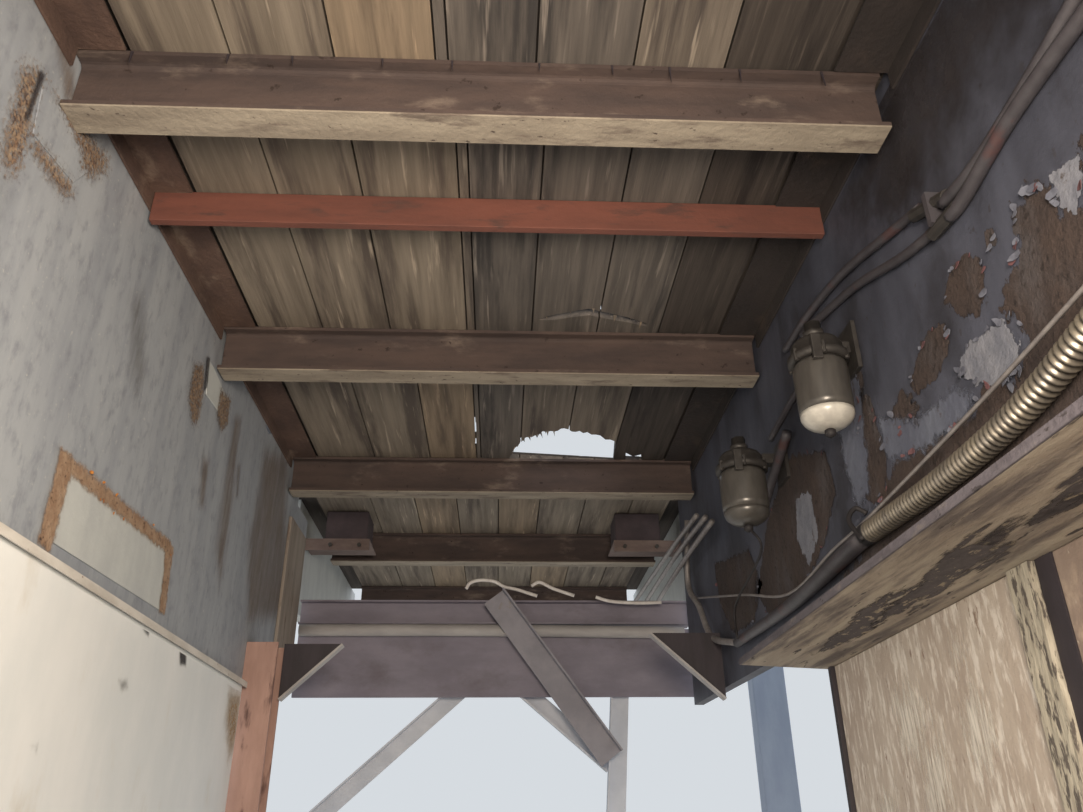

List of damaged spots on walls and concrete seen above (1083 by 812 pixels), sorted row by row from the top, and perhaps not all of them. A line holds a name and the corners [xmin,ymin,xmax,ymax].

peeling [839,134,1083,510]
peeling [713,449,836,633]
peeling [813,467,1083,655]
peeling [840,369,1083,581]